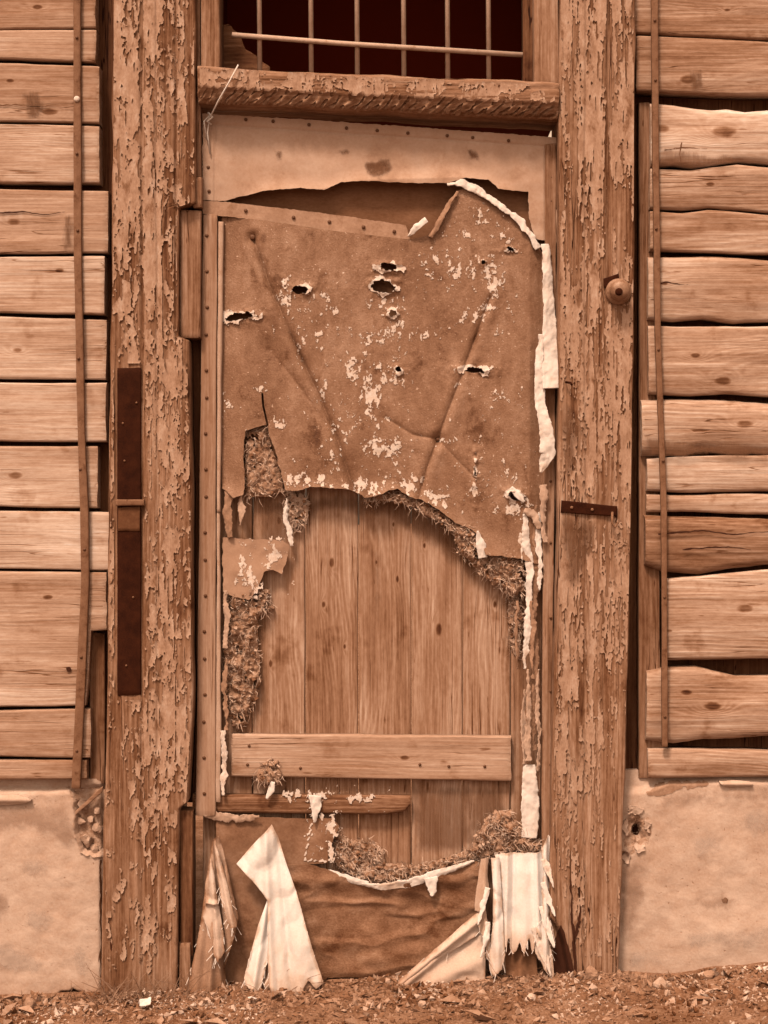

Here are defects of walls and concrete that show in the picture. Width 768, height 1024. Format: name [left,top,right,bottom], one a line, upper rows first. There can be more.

peeling [70,0,652,975]